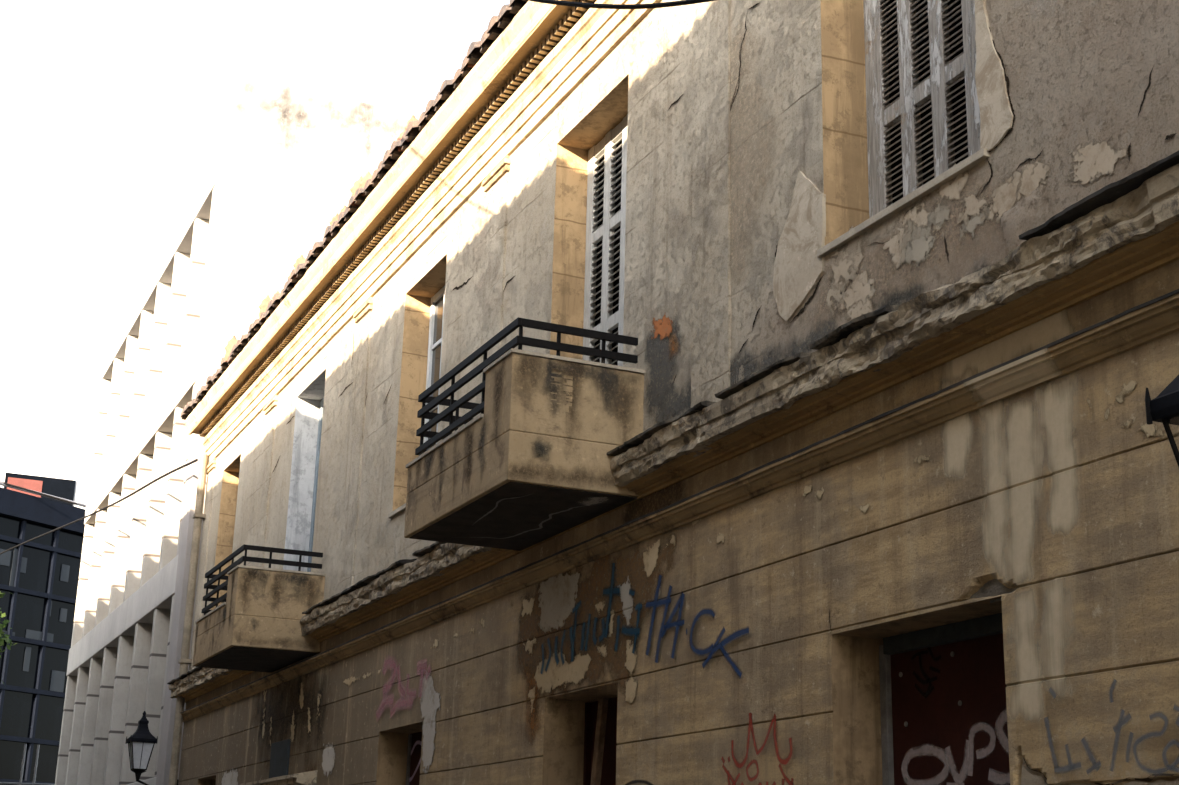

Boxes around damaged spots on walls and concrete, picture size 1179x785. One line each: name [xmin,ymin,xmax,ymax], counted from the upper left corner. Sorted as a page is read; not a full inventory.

crack [730,3,759,111]
peeling [974,0,1013,151]
peeling [1066,121,1130,192]
peeling [773,154,1055,323]
leakage [466,362,504,482]
crack [455,503,598,539]
leakage [510,466,613,483]
leakage [519,323,691,428]
leakage [730,321,835,386]
leakage [942,310,1078,720]
peeling [510,535,676,723]